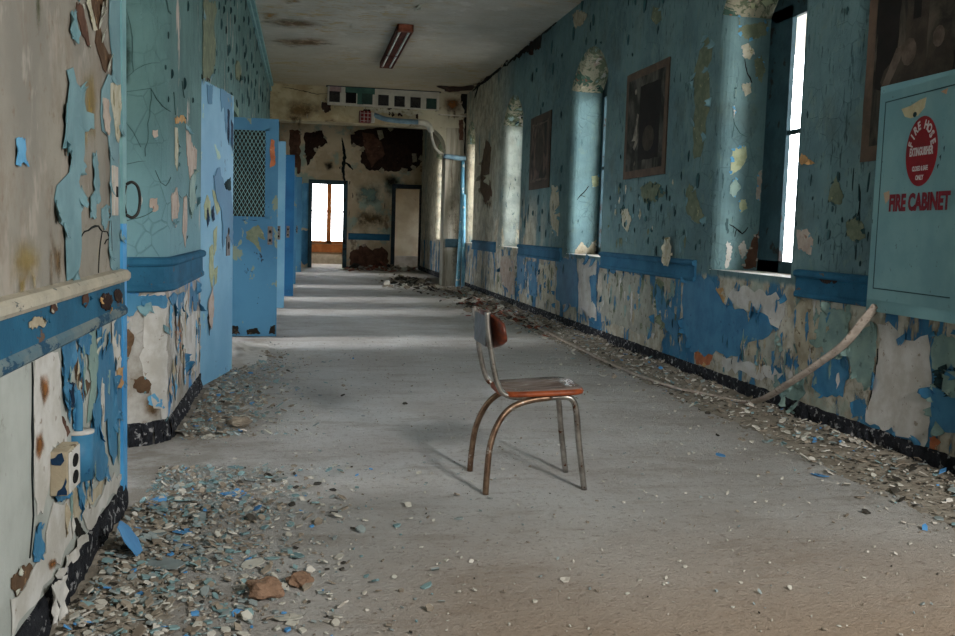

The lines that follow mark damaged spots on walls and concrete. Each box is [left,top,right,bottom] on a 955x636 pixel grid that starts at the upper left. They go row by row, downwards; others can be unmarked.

peeling [54,0,127,281]
crack [126,9,185,186]
spalling [289,128,327,265]
spalling [349,107,424,174]
peeling [522,165,563,237]
peeling [608,35,715,266]
spalling [725,231,759,269]
peeling [729,145,762,212]
peeling [732,15,769,115]
peeling [799,153,815,200]
peeling [795,168,870,266]
peeling [495,240,955,450]